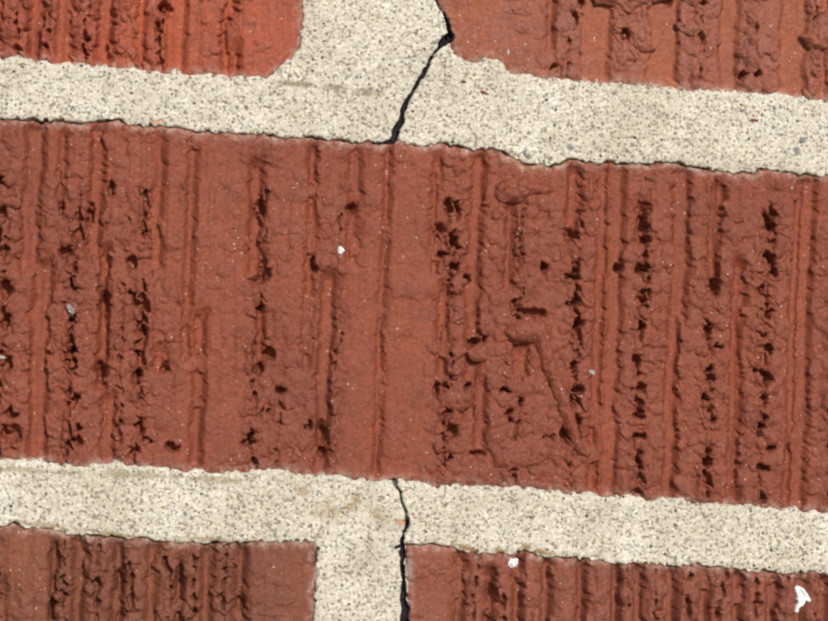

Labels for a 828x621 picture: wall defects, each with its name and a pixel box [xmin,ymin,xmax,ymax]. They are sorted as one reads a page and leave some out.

crack [372,0,465,149]
crack [392,480,410,621]